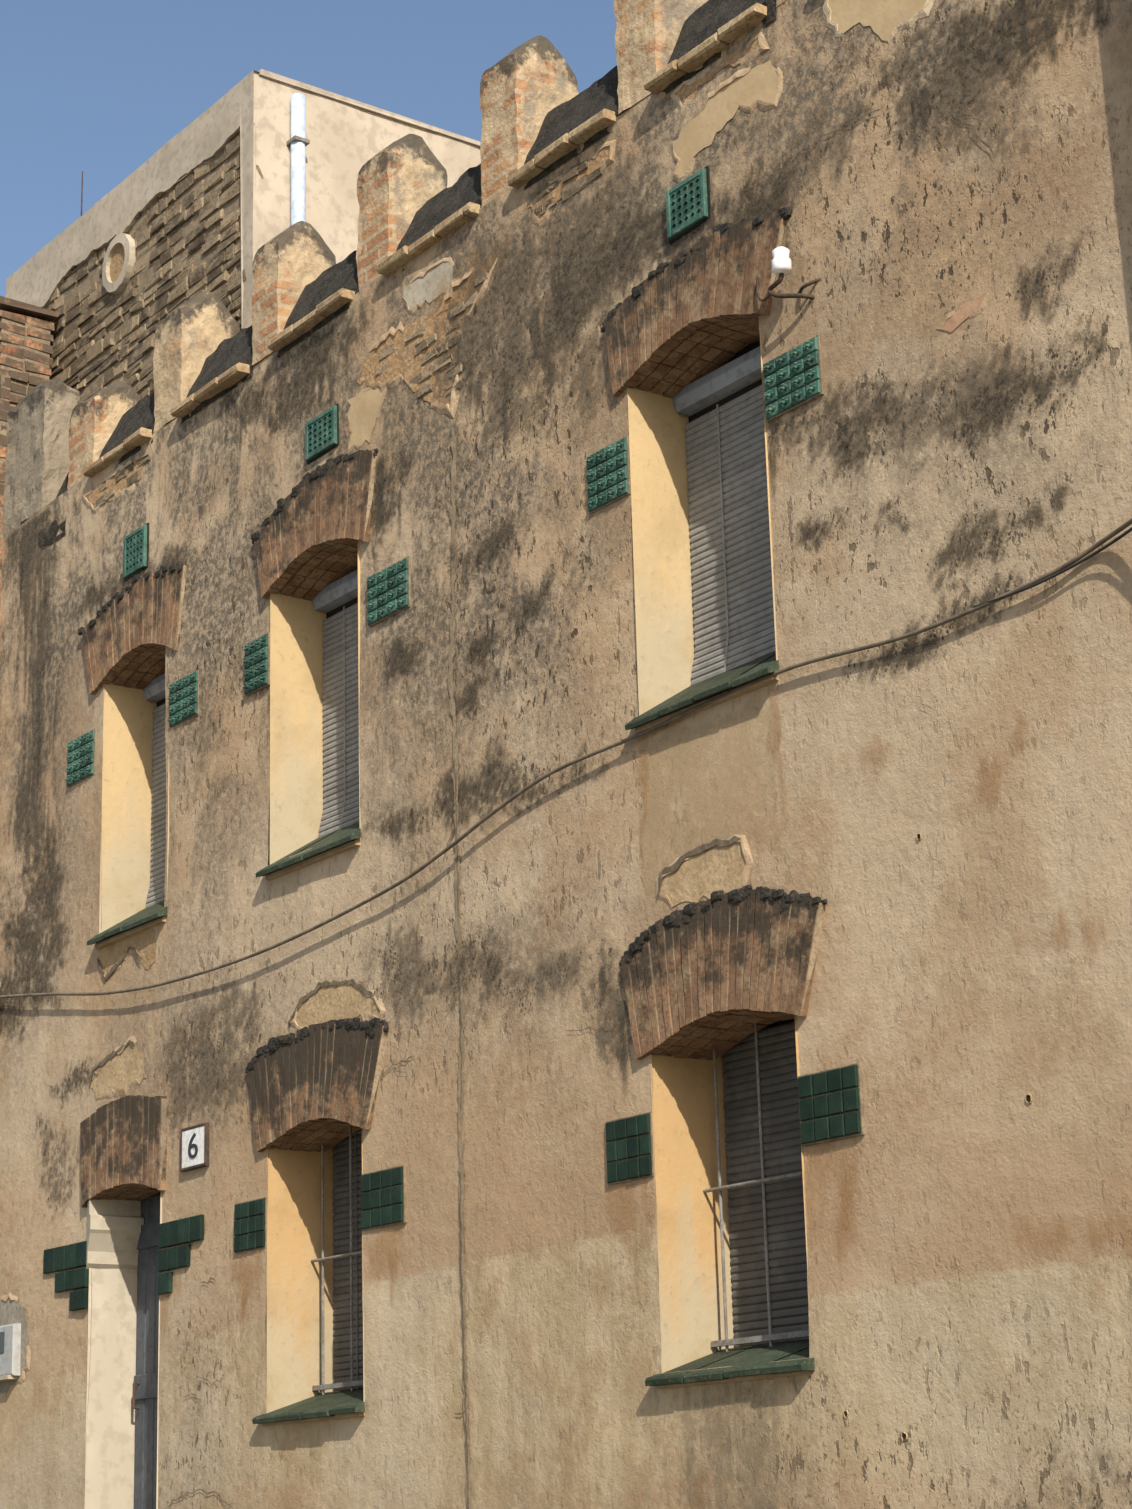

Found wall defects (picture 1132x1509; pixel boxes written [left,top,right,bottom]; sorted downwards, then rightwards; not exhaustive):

flaking render [822,0,935,43]
flaking render [670,32,783,184]
leakage [433,0,1107,450]
flaking render [347,252,504,454]
leakage [768,319,1110,488]
leakage [71,543,187,616]
leakage [844,482,1068,680]
leakage [0,508,69,1042]
flaking render [655,834,753,910]
flaking render [89,1036,146,1100]
flaking render [288,979,386,1032]